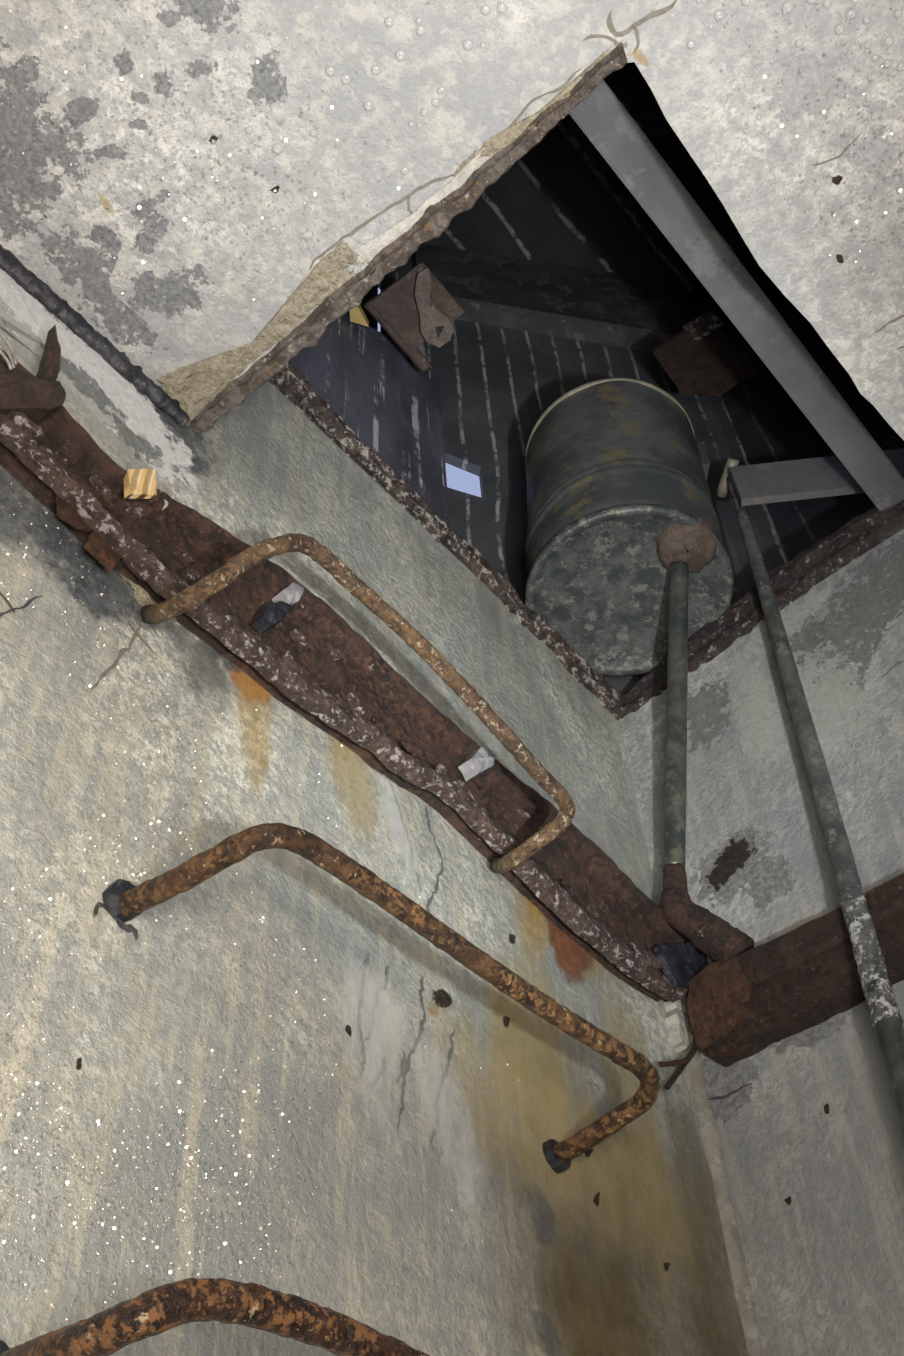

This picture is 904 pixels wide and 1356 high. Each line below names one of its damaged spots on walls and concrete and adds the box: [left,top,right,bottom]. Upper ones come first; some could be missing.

crack [0,592,42,617]
corrosion [231,663,270,702]
corrosion [525,897,592,982]